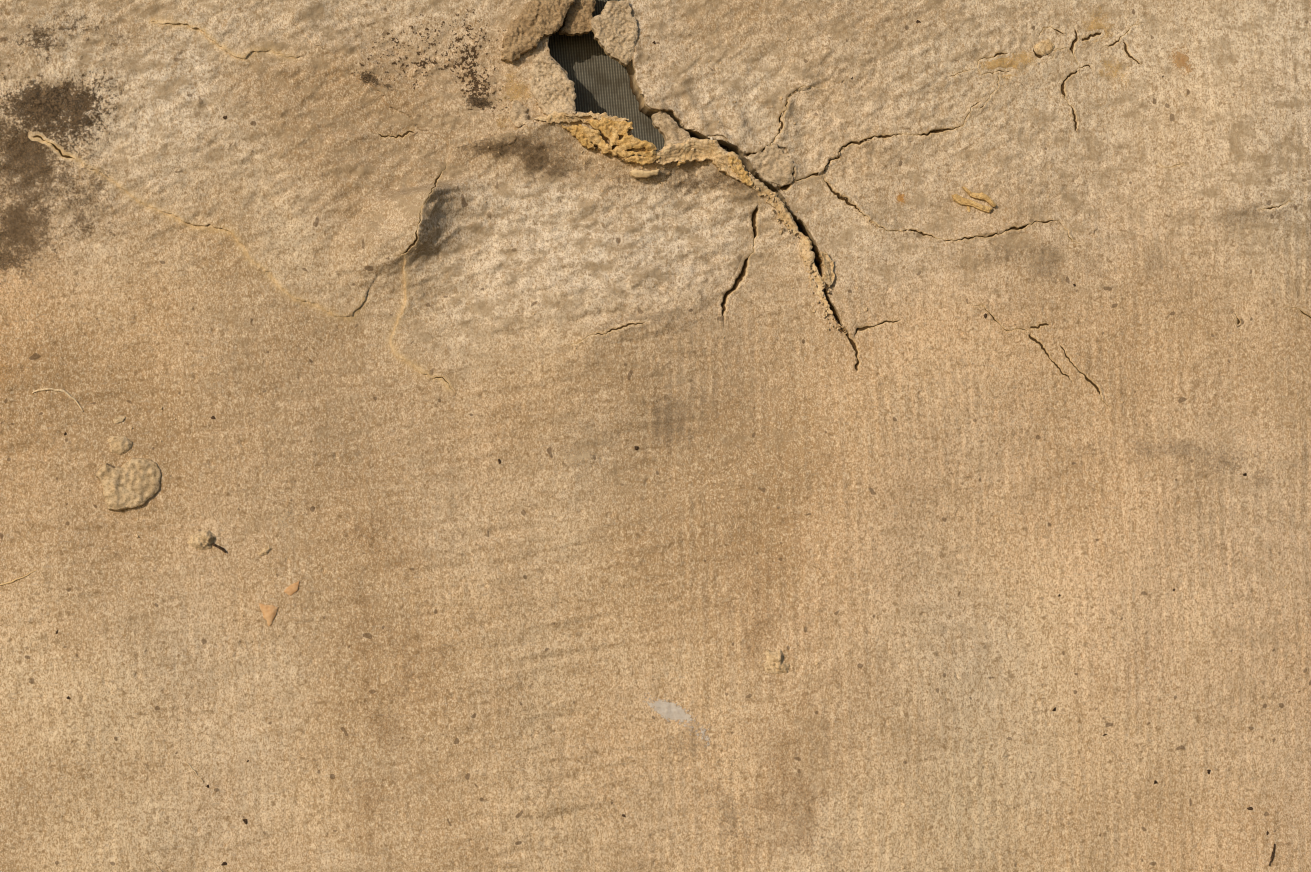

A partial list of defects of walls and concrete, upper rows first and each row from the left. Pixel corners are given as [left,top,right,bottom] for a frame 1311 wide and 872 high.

water stain [17,15,99,60]
crack [28,129,85,165]
water stain [0,70,117,272]
peeling [28,0,753,401]
crack [373,126,451,265]
crack [501,0,1149,377]
peeling [626,0,1106,335]
crack [957,297,1116,419]